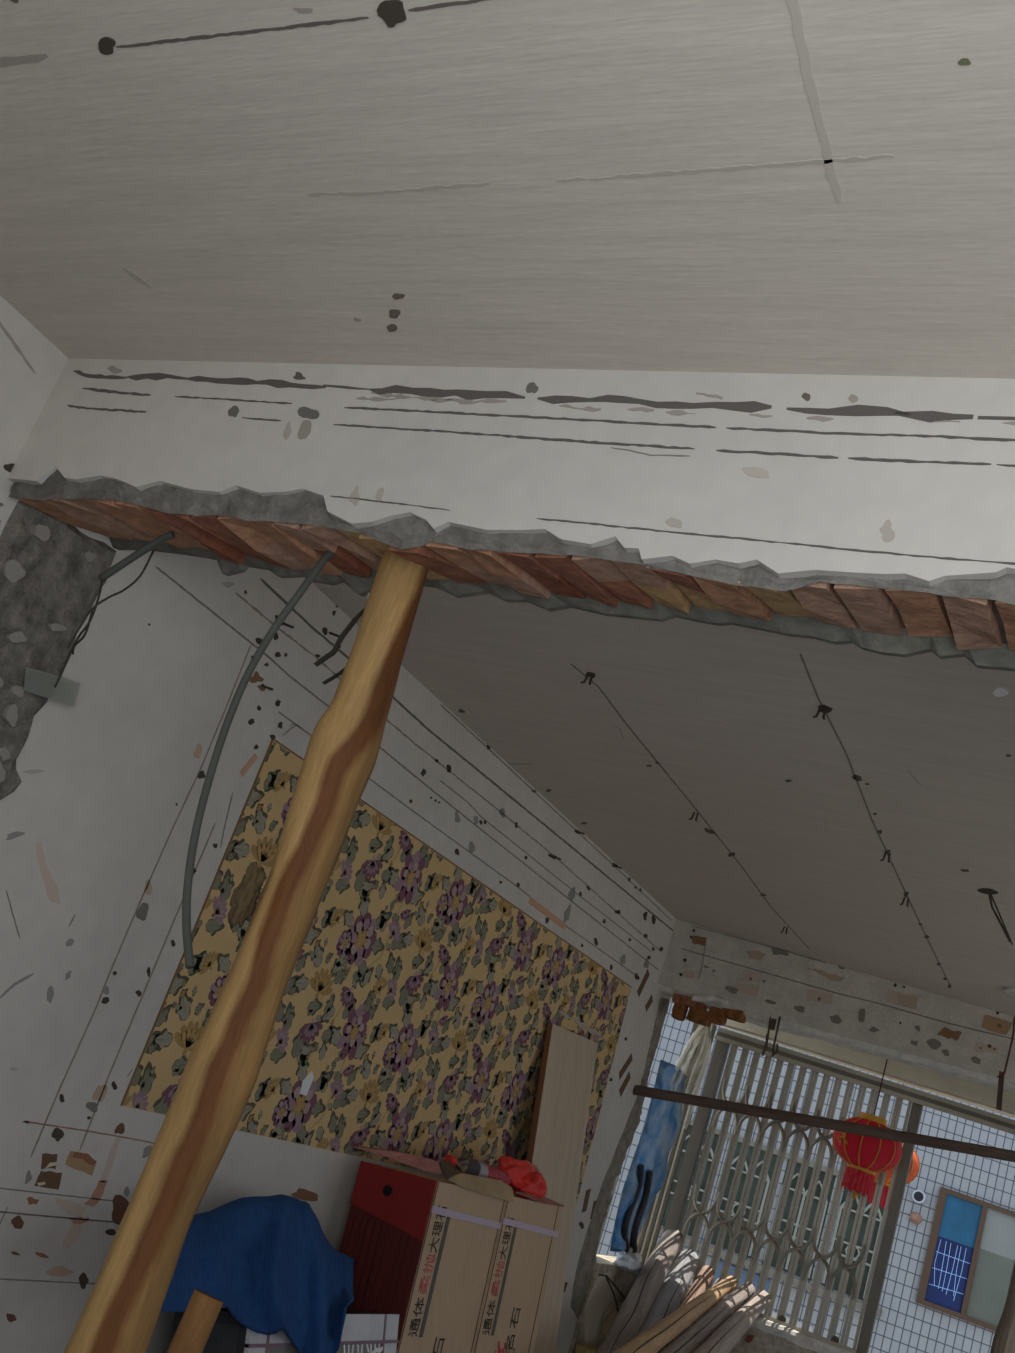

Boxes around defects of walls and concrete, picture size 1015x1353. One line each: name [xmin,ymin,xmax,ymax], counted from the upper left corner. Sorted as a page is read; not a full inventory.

crack [116,17,369,48]
crack [408,0,486,12]
crack [67,370,1015,467]
flaking render [0,463,1015,800]
crack [369,653,1015,1040]
spalling [136,903,149,921]